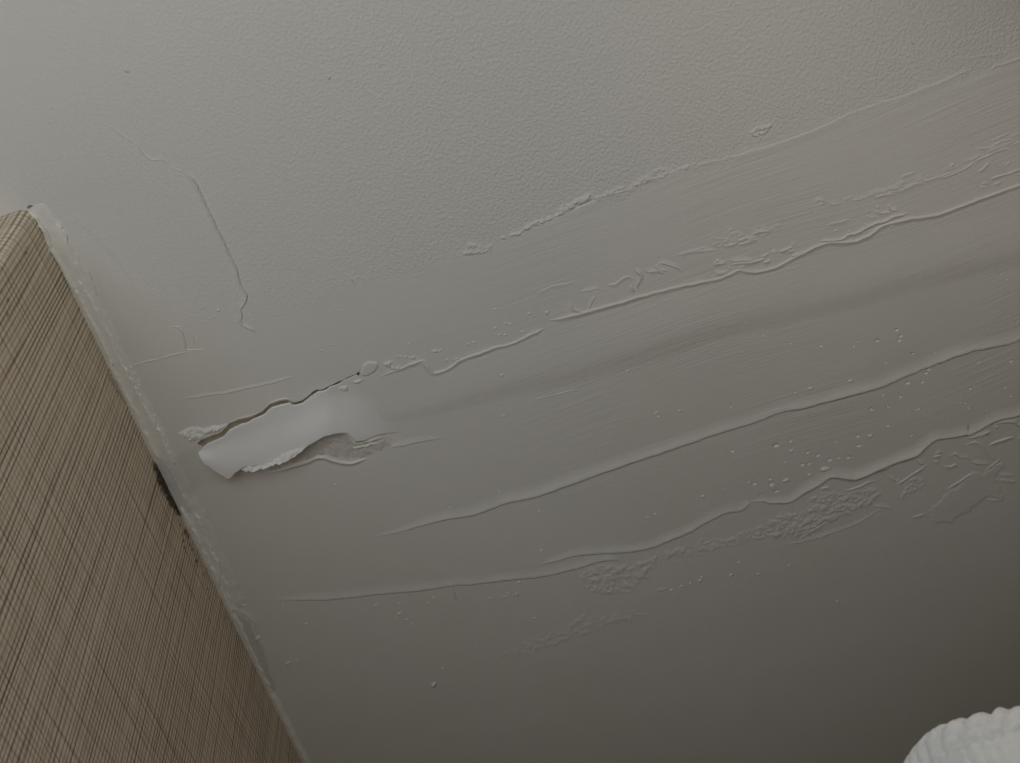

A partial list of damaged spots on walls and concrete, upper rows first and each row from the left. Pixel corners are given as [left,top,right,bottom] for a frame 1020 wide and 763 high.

crack [107,124,256,333]
peeling [177,361,444,480]
damp [153,463,204,575]